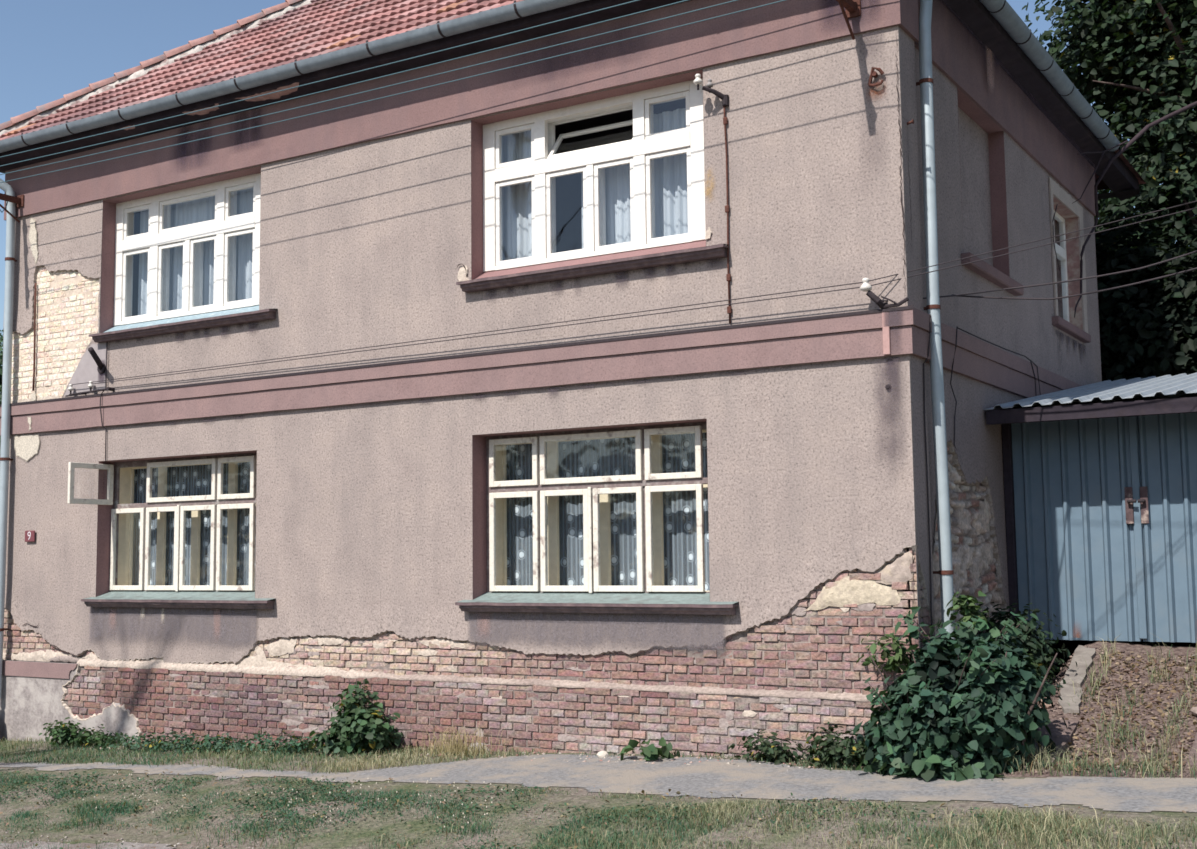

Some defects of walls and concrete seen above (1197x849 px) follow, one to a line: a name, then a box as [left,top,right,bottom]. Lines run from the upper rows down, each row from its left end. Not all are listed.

flaking render [11,218,100,403]
peeling [14,417,39,461]
flaking render [3,439,1007,759]